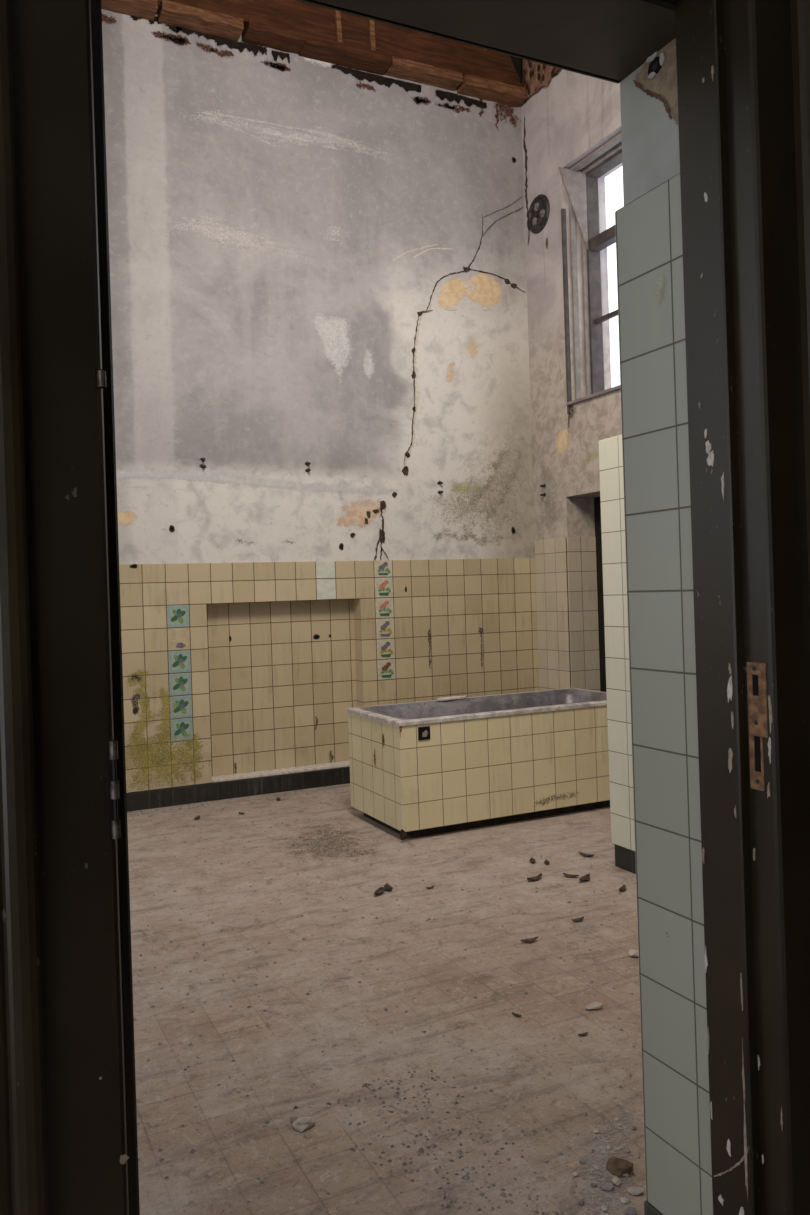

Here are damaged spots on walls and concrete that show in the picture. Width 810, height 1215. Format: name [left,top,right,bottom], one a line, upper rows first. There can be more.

spalling [102,12,488,113]
spalling [633,39,678,125]
crack [402,117,530,476]
flaking render [438,273,503,311]
peeling [116,467,399,538]
crack [374,503,389,560]
peeling [704,429,725,501]
water stain [125,668,217,793]
peeling [727,1038,764,1215]